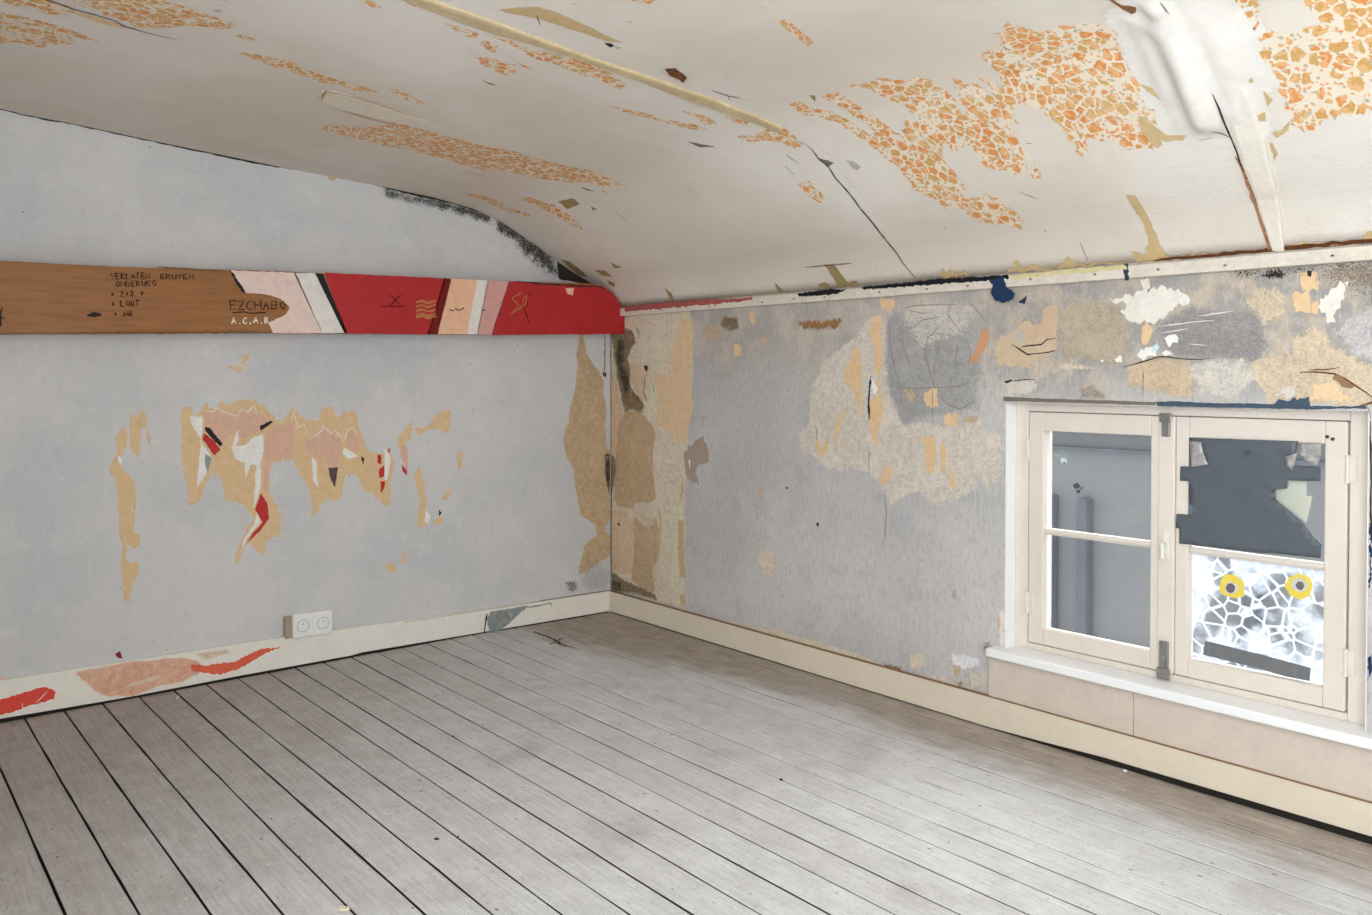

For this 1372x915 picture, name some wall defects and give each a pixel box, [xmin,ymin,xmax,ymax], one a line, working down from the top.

peeling [779,20,813,46]
peeling [1110,0,1136,14]
peeling [1232,0,1259,33]
peeling [1138,116,1186,148]
peeling [1249,78,1289,161]
peeling [109,410,151,601]
peeling [180,398,452,564]
peeling [563,289,709,609]
crack [802,142,985,428]
peeling [799,195,1169,509]
spalling [1003,271,1372,588]